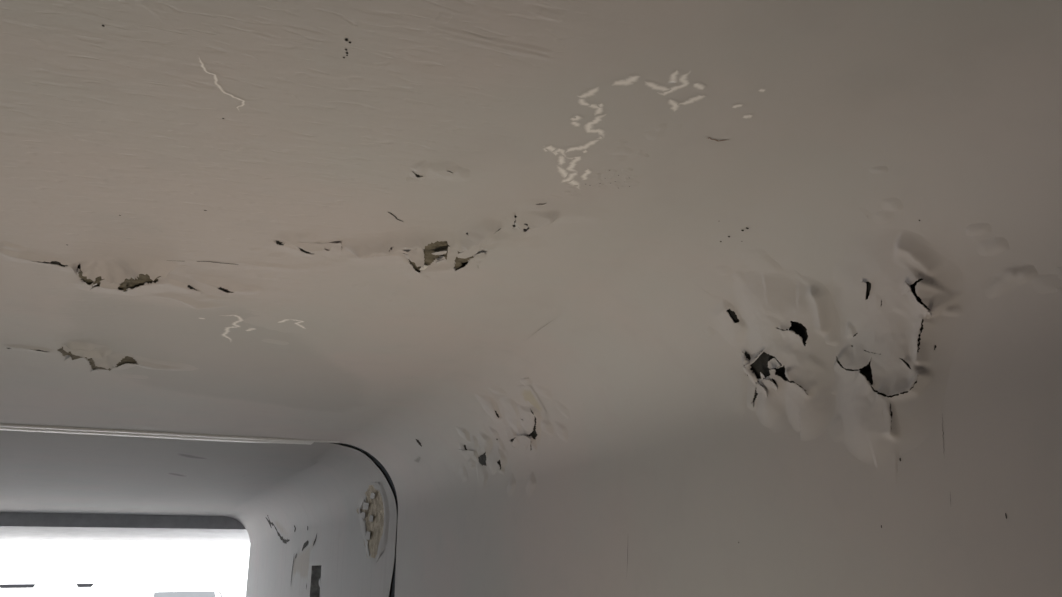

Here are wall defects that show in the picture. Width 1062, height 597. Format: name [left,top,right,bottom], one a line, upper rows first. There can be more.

peeling [0,198,613,317]
peeling [0,341,198,379]
peeling [693,228,968,486]
peeling [453,378,570,502]
spalling [357,482,390,563]